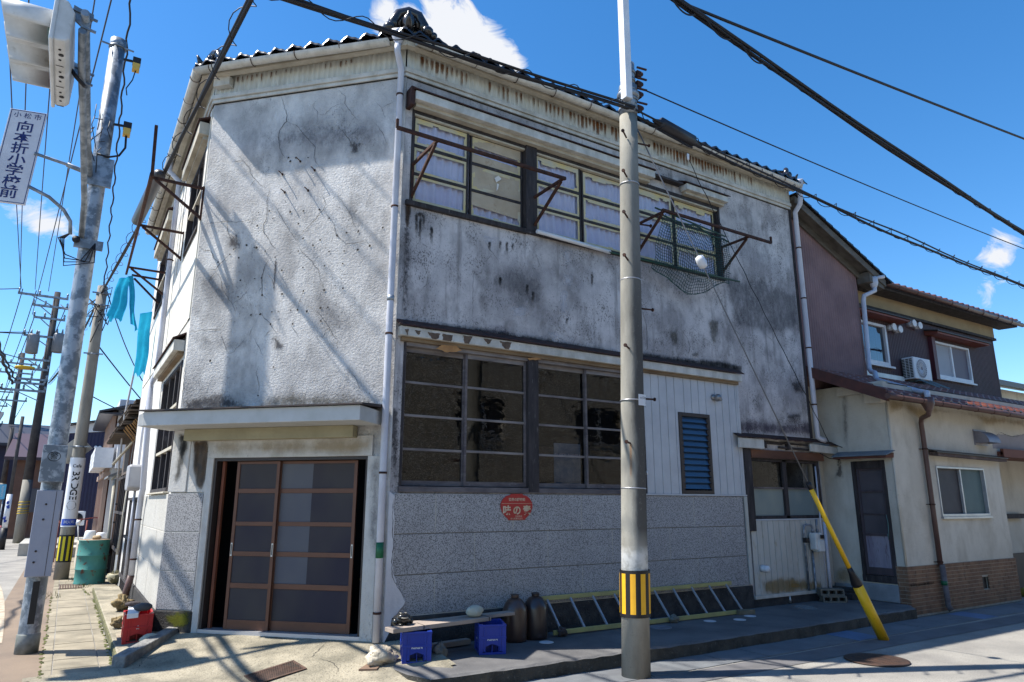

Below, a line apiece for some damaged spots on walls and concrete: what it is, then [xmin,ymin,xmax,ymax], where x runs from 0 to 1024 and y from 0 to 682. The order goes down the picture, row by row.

rust [421,56,467,84]
crack [278,86,408,162]
rust [489,82,620,140]
crack [182,157,368,399]
damp [404,213,433,310]
peeling [405,329,512,352]
damp [643,353,742,371]
damp [741,414,810,434]